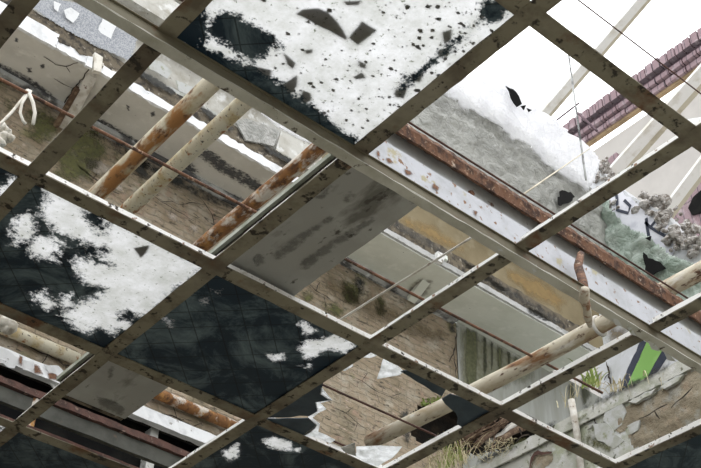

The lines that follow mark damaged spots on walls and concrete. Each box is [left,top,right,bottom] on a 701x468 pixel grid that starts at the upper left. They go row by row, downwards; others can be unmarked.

flaking render [592,371,701,449]